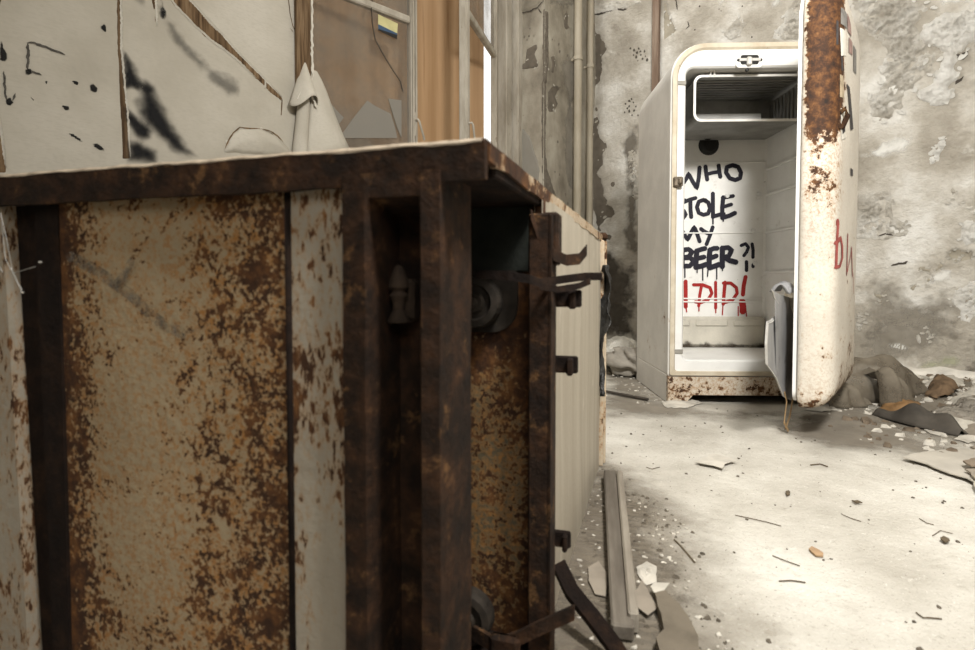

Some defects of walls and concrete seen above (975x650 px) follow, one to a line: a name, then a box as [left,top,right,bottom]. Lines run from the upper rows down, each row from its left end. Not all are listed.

damp [606,252,635,335]